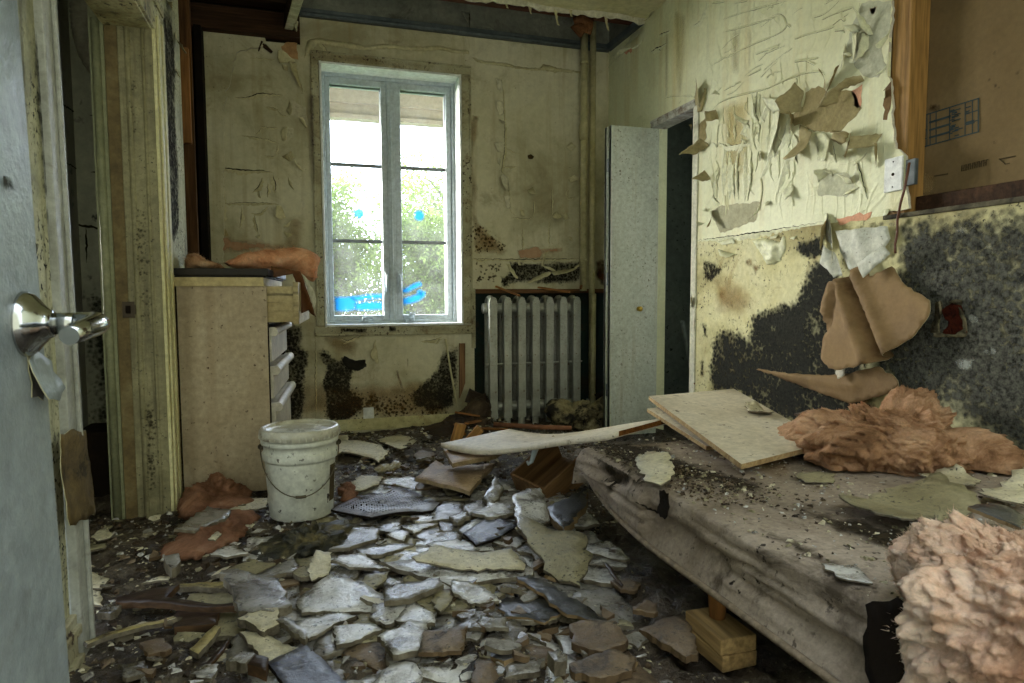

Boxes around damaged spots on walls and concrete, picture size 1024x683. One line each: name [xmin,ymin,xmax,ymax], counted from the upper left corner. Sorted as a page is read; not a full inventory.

peeling [679,78,747,155]
peeling [759,0,892,197]
damp [472,226,580,286]
peeling [692,170,710,181]
peeling [695,185,794,233]
peeling [819,209,889,250]
damp [701,210,1024,450]
damp [286,326,457,420]